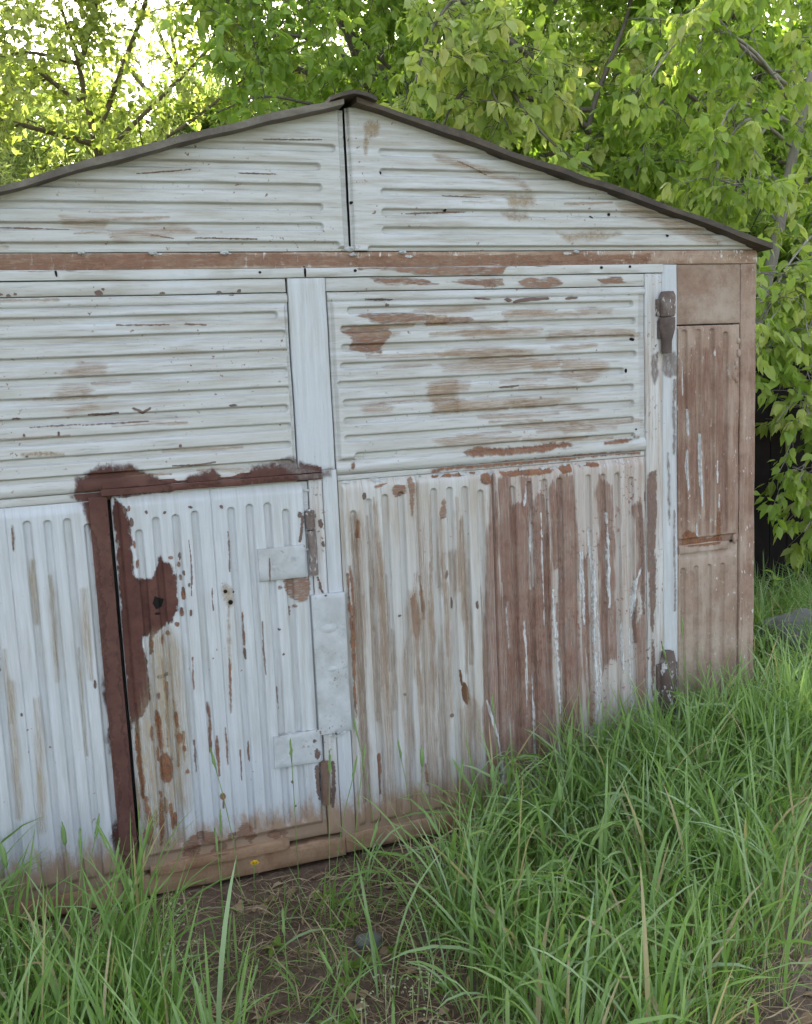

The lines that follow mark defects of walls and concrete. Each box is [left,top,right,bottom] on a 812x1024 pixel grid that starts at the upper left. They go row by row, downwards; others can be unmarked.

corrosion [0,253,650,287]
corrosion [342,309,521,358]
corrosion [416,330,640,473]
corrosion [682,509,722,547]
peeling [278,576,327,615]
corrosion [632,470,657,697]
corrosion [347,567,365,747]
corrosion [450,670,469,705]
corrosion [495,495,571,789]
corrosion [135,660,197,845]
corrosion [207,703,250,780]
peeling [279,730,336,808]